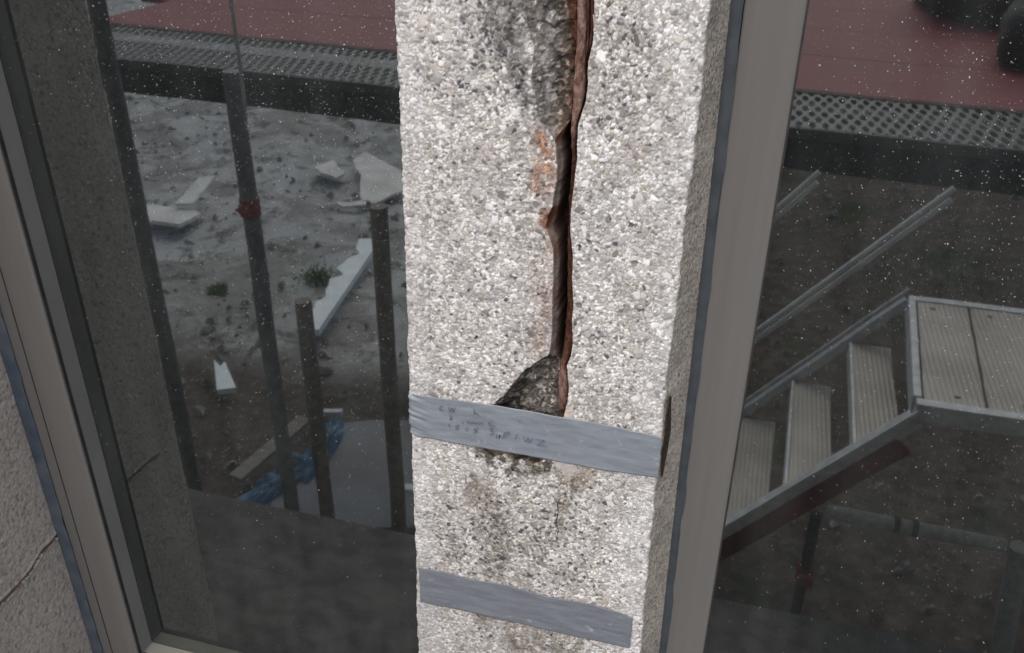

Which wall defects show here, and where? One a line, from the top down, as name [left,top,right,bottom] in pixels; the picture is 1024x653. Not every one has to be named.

spalling [524,0,577,139]
rust [566,0,594,85]
rust [539,209,552,243]
crack [546,2,598,406]
spalling [493,354,574,418]
crack [0,536,57,606]